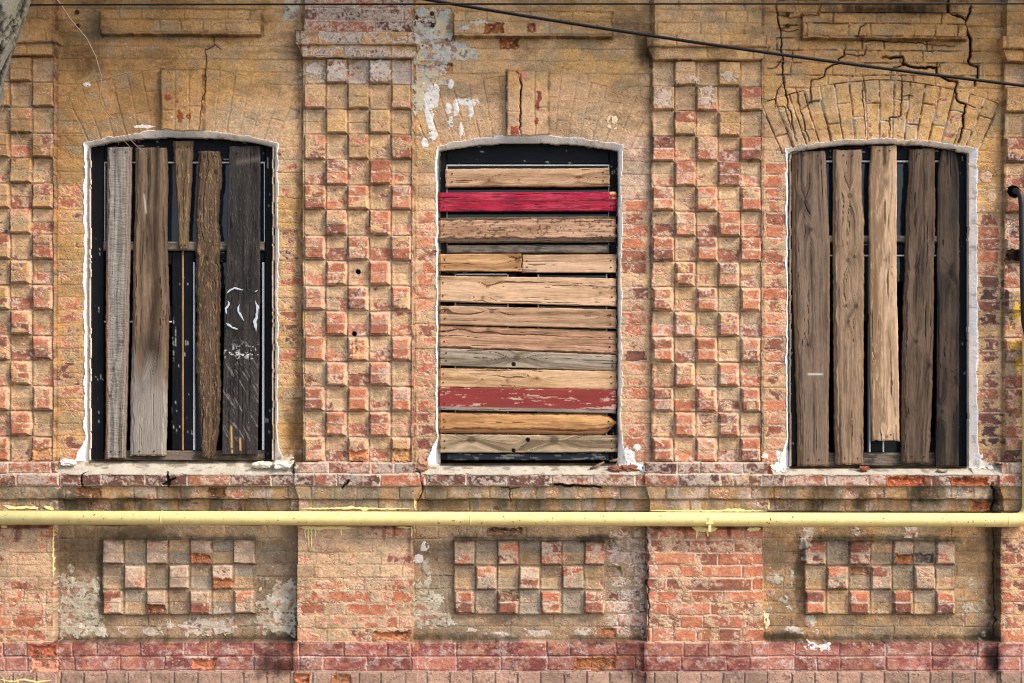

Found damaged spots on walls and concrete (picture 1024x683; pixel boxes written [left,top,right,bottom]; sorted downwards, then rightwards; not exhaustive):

peeling [411,6,536,149]
crack [515,72,523,132]
crack [768,0,978,142]
peeling [29,564,128,673]
peeling [143,604,237,641]
peeling [254,576,299,638]